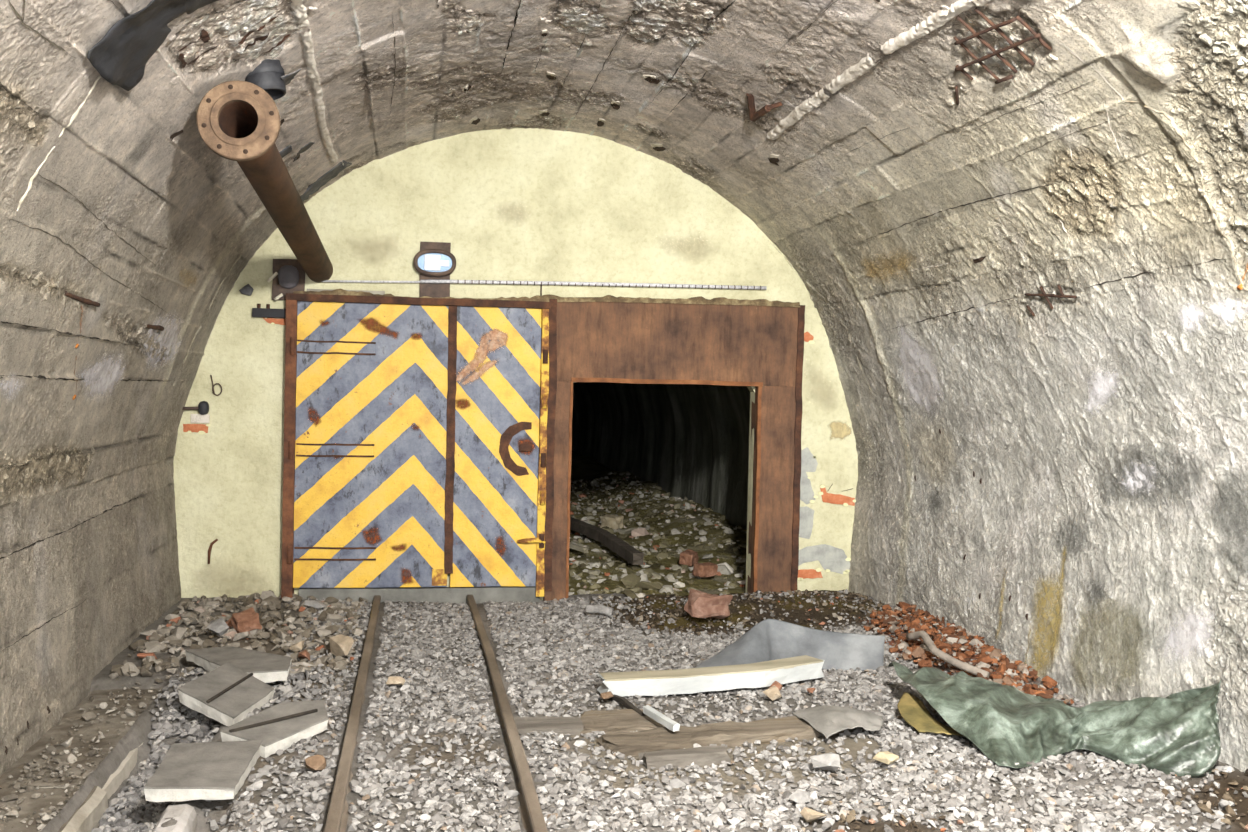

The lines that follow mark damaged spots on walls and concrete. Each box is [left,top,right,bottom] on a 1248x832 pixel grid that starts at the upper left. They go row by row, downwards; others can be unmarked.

spalling [169,0,318,84]
spalling [940,5,1058,106]
spalling [1178,0,1248,79]
spalling [0,96,35,131]
spalling [1046,150,1127,232]
peeling [1125,100,1248,291]
crack [6,598,89,648]